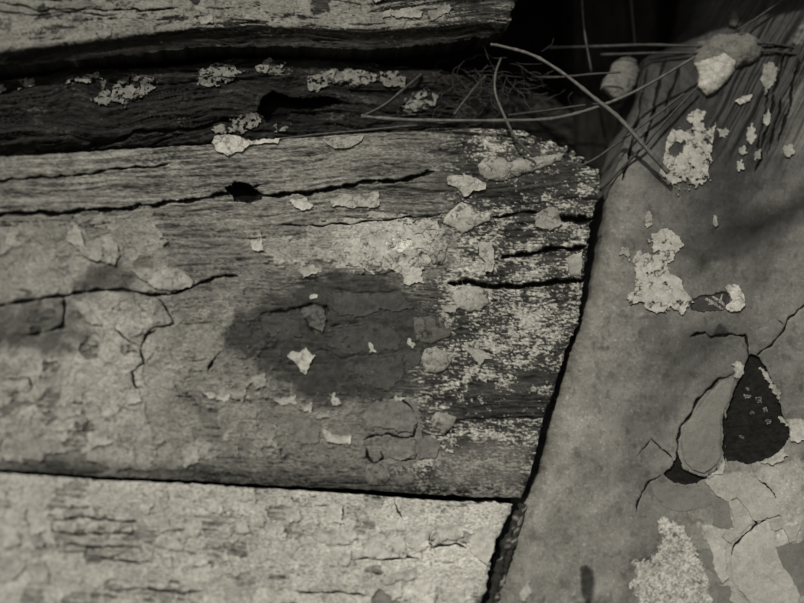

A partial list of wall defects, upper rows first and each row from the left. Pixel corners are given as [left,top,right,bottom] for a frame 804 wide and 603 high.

crack [0,2,175,17]
peeling [306,69,406,93]
crack [0,163,170,183]
crack [0,170,435,218]
peeling [209,112,291,156]
crack [279,212,449,227]
peeling [619,211,745,315]
peeling [658,109,729,196]
crack [0,275,238,392]
leakage [226,275,438,407]
peeling [260,220,459,461]
peeling [629,354,804,603]